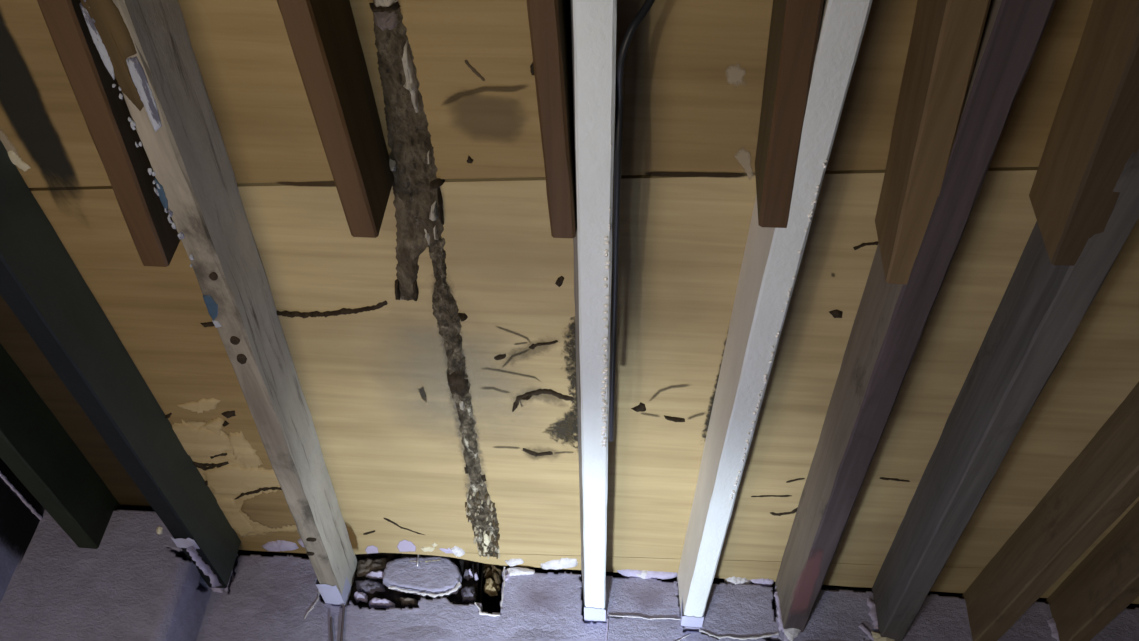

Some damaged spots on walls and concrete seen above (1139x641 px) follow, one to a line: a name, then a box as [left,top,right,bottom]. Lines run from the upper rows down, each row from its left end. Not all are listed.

leakage [419,339,450,402]
leakage [465,369,478,388]
leakage [546,317,578,448]
peeling [165,398,305,552]
flaking render [347,543,578,617]